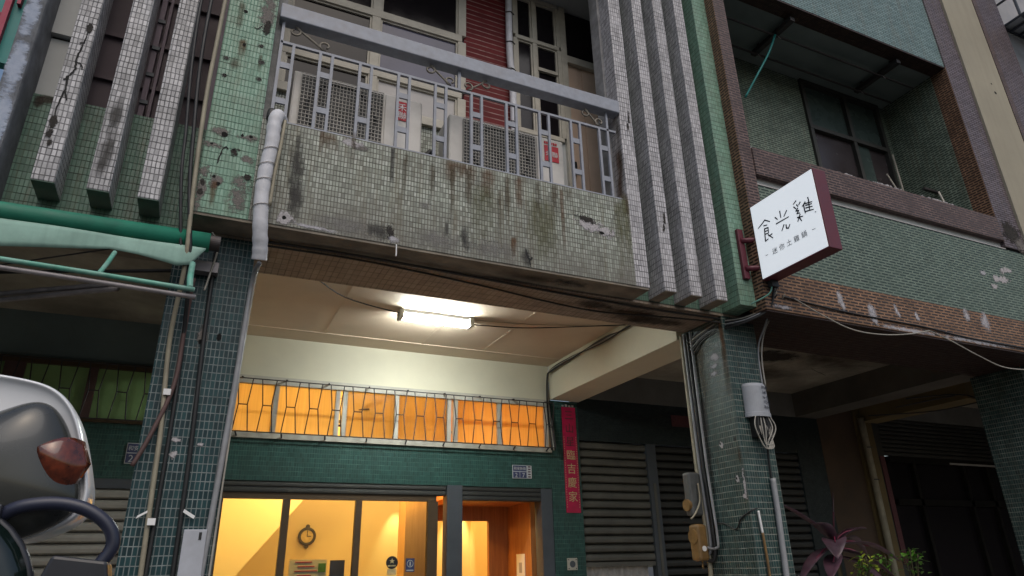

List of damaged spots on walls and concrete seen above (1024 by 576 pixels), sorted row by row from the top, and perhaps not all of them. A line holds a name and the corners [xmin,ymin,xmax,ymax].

crack [54,32,88,115]
spalling [194,127,257,210]
spalling [573,214,615,239]
spalling [981,267,1011,289]